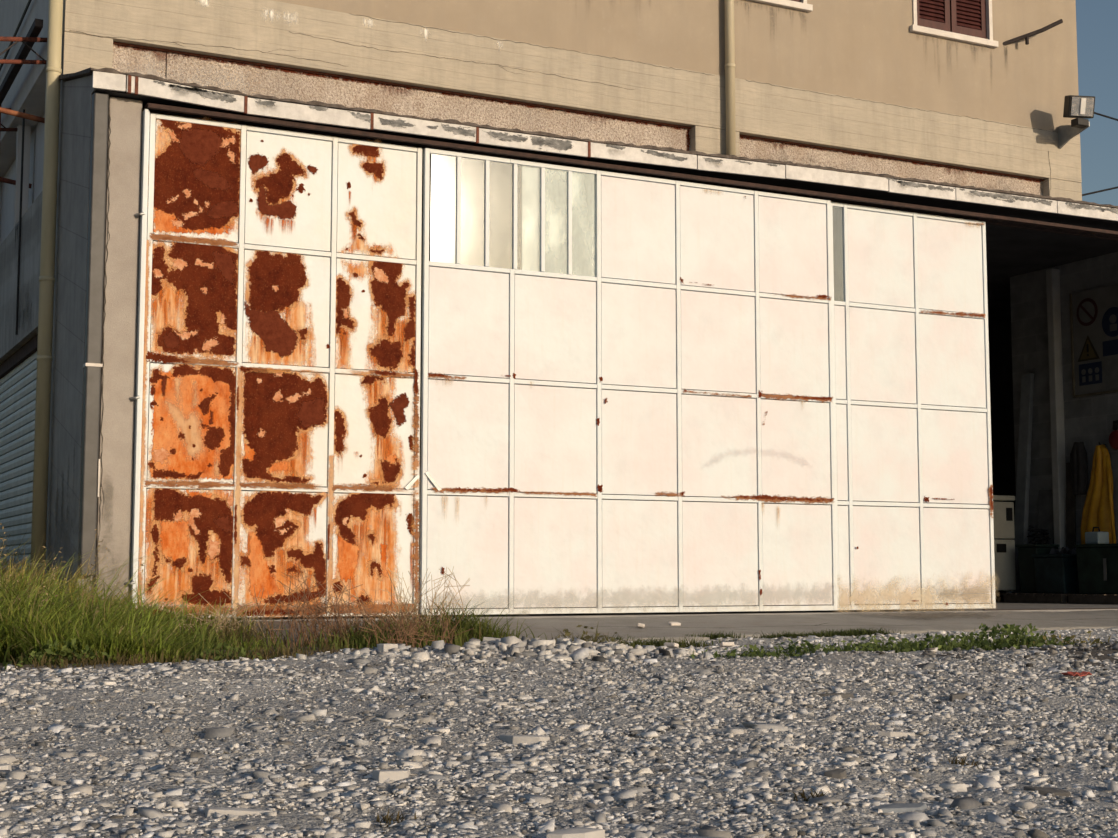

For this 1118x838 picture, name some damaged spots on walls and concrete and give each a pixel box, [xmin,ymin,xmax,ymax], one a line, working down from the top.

rust [137,117,466,618]
rust [684,389,832,425]
rust [432,484,603,497]
rust [722,494,834,504]